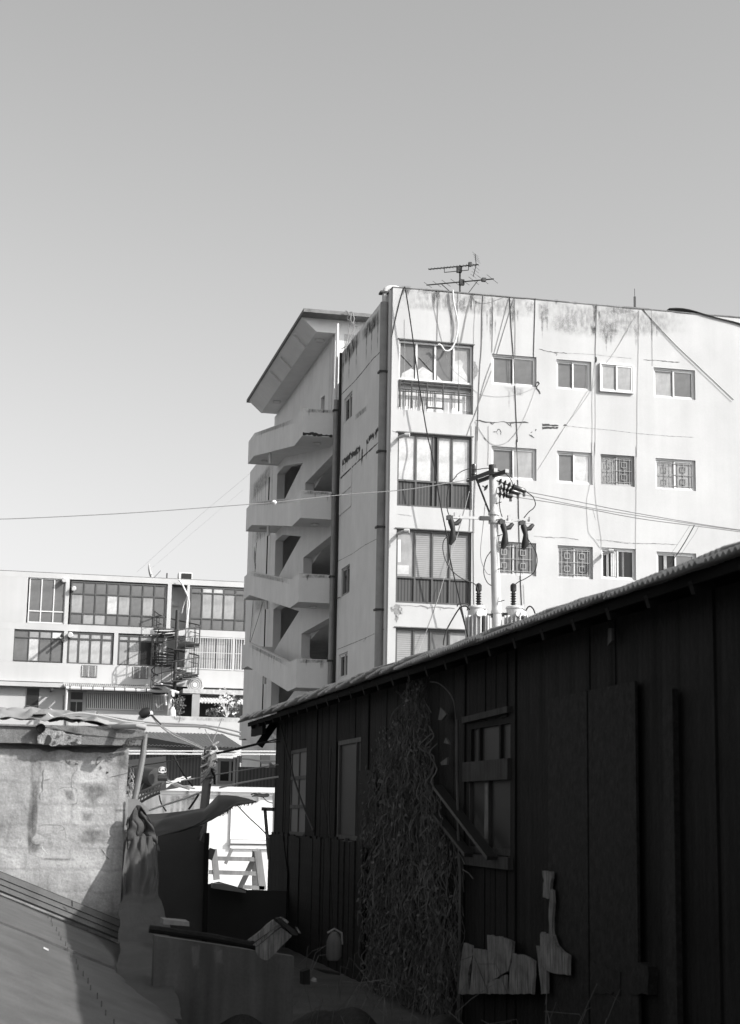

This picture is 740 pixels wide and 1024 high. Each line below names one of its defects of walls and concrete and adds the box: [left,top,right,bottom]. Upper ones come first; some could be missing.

damp [345,314,378,363]
spalling [37,728,82,746]